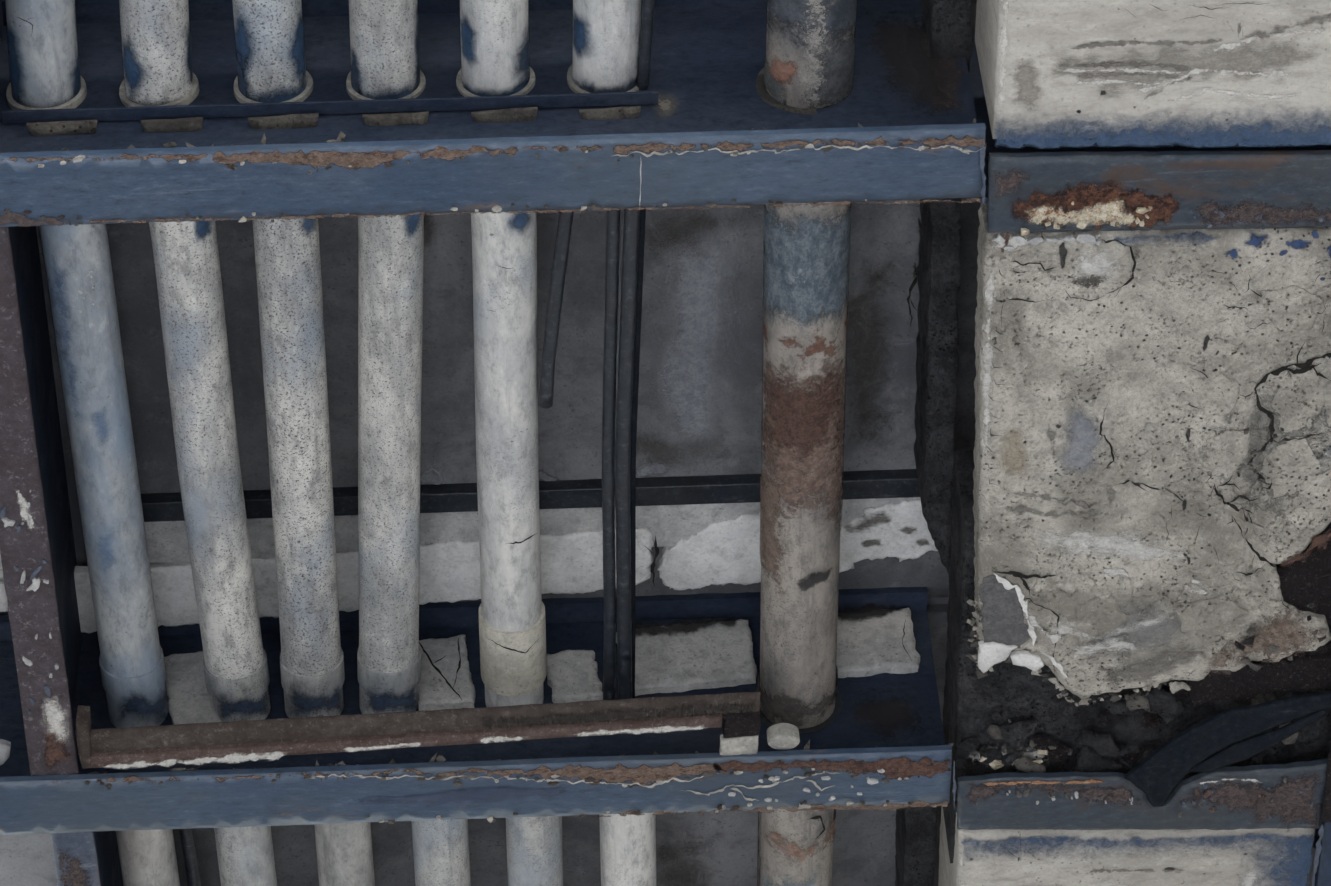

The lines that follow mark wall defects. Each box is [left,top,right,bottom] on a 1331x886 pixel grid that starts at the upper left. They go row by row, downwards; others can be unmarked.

rust [0,135,986,175]
rust [1010,180,1331,236]
spalling [991,232,1102,277]
rust [760,305,849,607]
crack [1099,263,1331,614]
peeling [1190,370,1331,559]
crack [995,571,1059,673]
spalling [942,297,1251,864]
crack [419,637,462,700]
spalling [1229,691,1331,767]
rust [216,757,951,788]
rust [580,800,948,886]